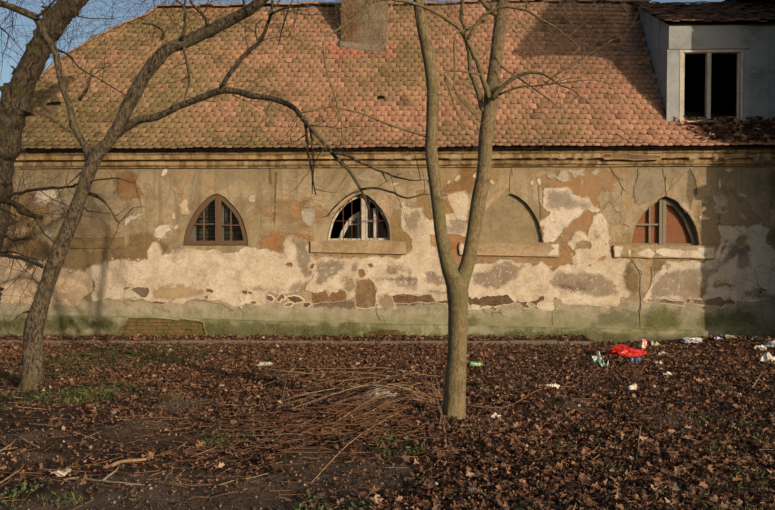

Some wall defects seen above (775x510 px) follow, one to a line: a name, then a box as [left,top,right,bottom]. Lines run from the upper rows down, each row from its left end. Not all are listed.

peeling [0,252,48,306]
peeling [49,197,448,310]
peeling [445,174,471,255]
peeling [468,167,775,313]
crack [602,154,697,228]
spalling [116,317,207,337]